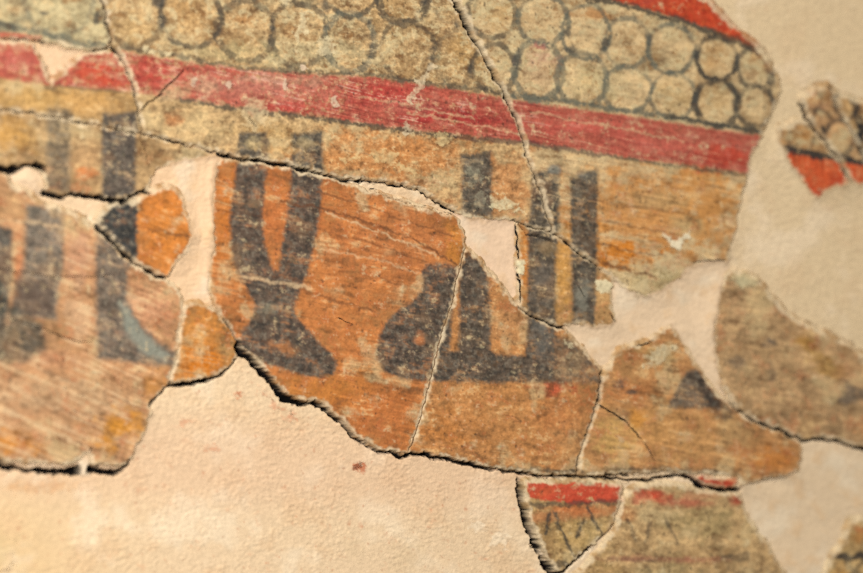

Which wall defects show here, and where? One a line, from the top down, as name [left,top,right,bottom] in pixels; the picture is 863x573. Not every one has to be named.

crack [0,109,454,215]
crack [1,227,127,278]
spalling [150,152,226,308]
spalling [453,162,528,298]
crack [512,220,593,328]
crack [169,376,216,387]
crack [233,346,334,421]
crack [349,247,735,492]
crack [521,519,559,573]
spalling [734,438,863,573]